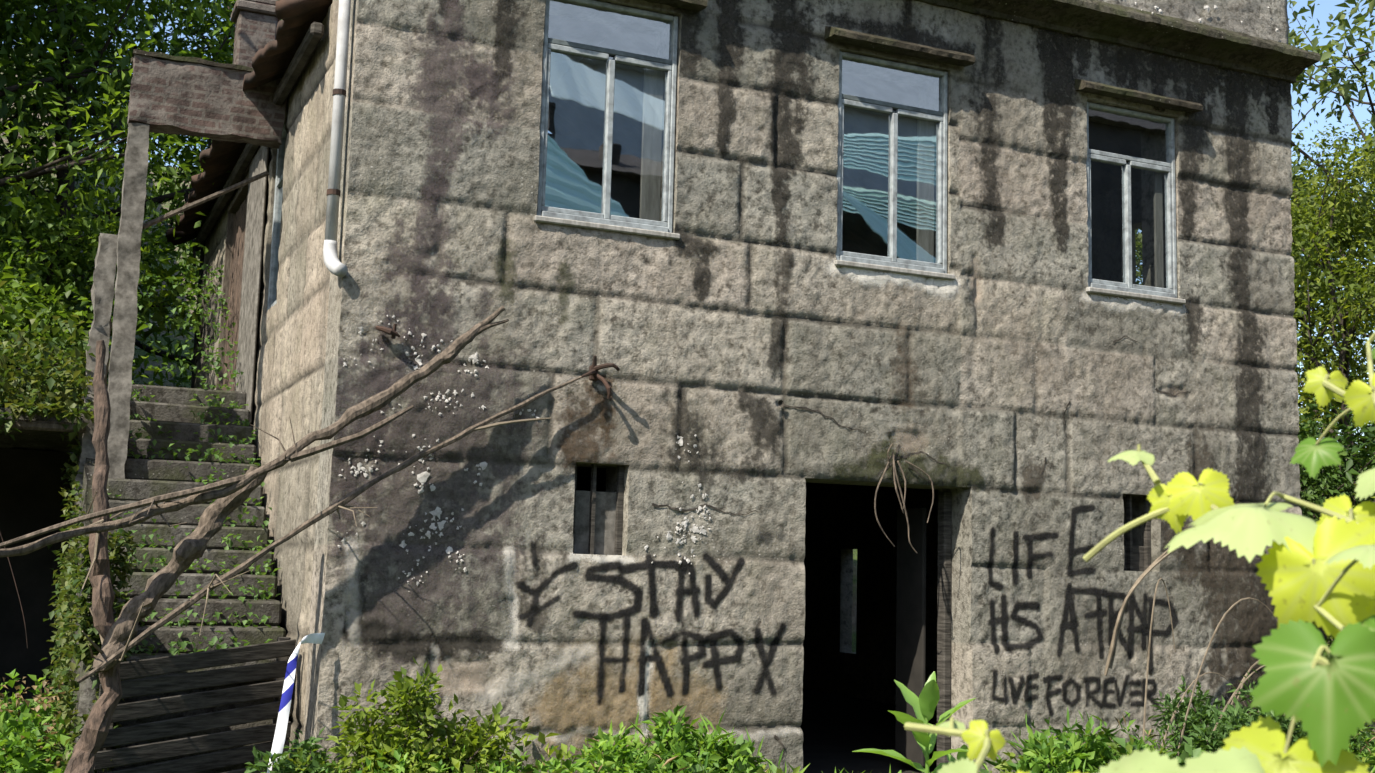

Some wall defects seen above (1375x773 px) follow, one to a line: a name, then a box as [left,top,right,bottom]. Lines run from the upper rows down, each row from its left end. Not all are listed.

damp [329,0,546,725]
damp [668,385,781,493]
damp [762,0,1006,367]
damp [1023,465,1046,500]
damp [1032,26,1292,505]
damp [1161,520,1278,724]